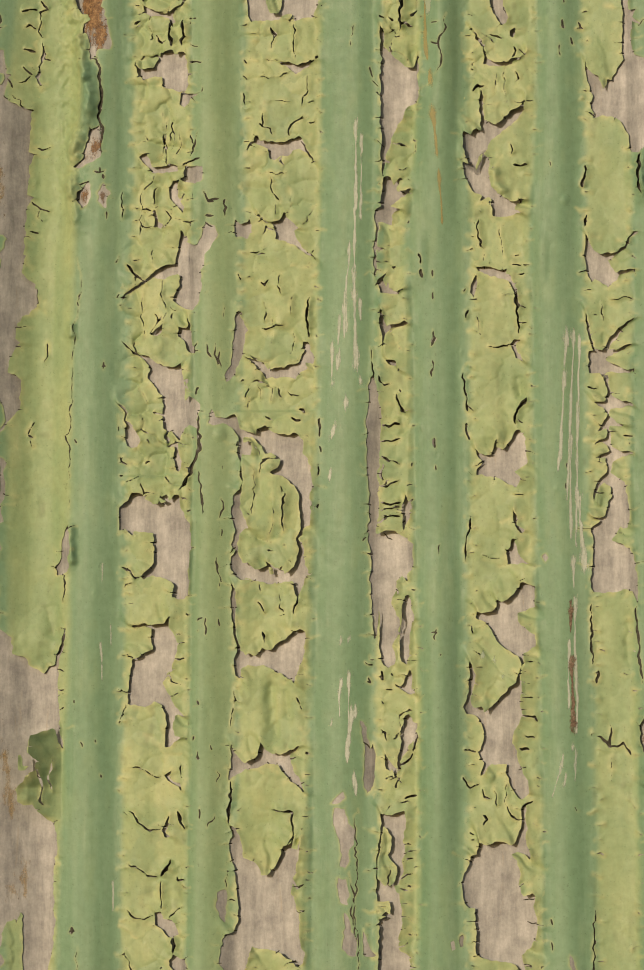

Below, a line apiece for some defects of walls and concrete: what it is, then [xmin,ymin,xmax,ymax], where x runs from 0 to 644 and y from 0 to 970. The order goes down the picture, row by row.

corrosion [82,0,108,50]
crack [243,61,315,133]
peeling [234,0,331,35]
peeling [450,0,539,371]
peeling [570,0,644,192]
crack [262,297,310,346]
peeling [0,13,75,970]
peeling [104,13,430,970]
peeling [574,221,644,679]
peeling [449,416,552,970]
corrosion [568,655,578,733]
peeling [631,708,644,761]